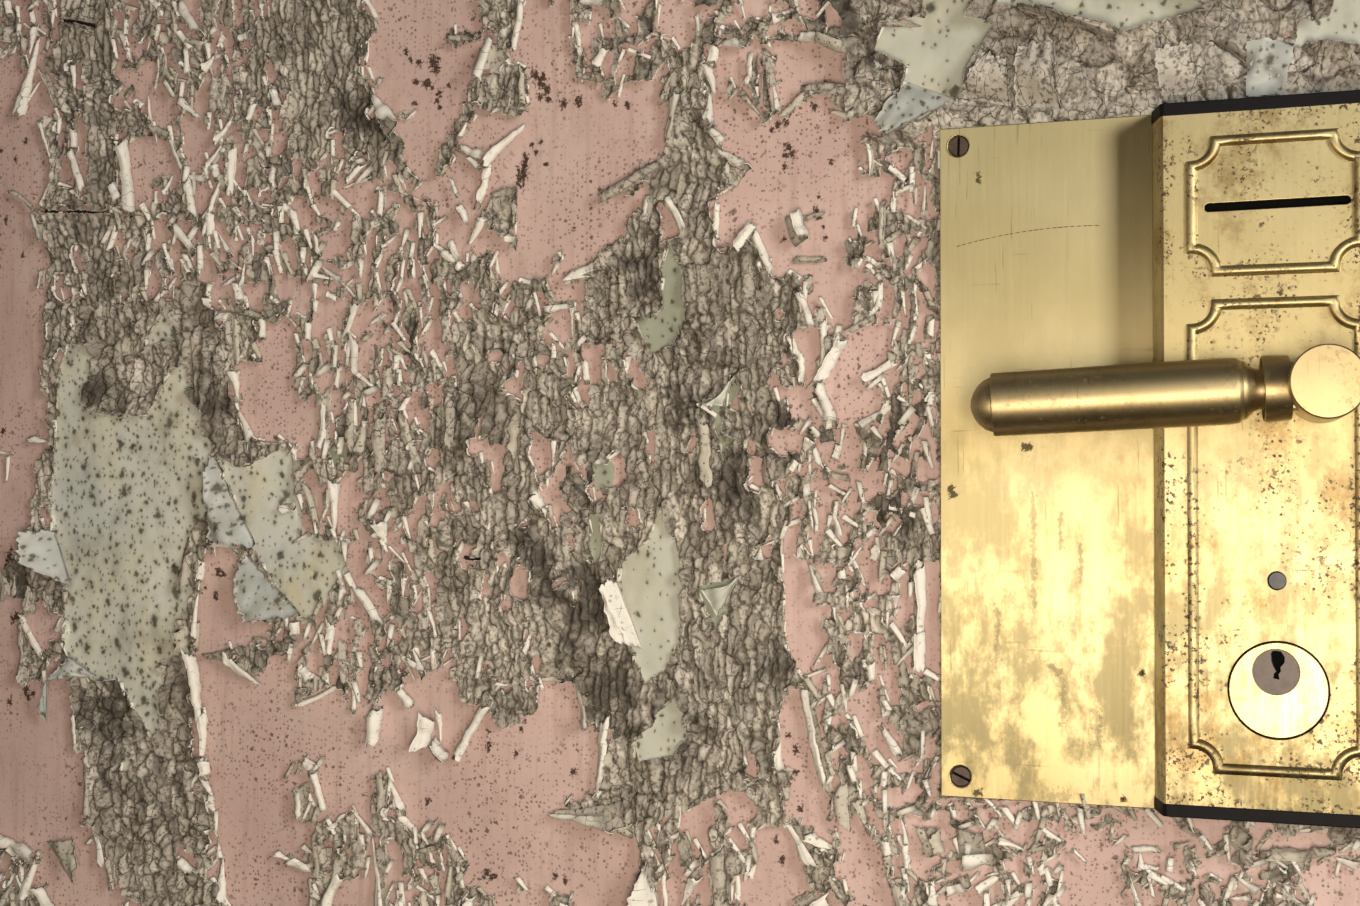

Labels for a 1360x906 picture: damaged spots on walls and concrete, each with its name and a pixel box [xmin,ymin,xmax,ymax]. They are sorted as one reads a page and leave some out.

peeling [0,0,434,906]
peeling [274,754,496,906]
peeling [347,0,1360,906]